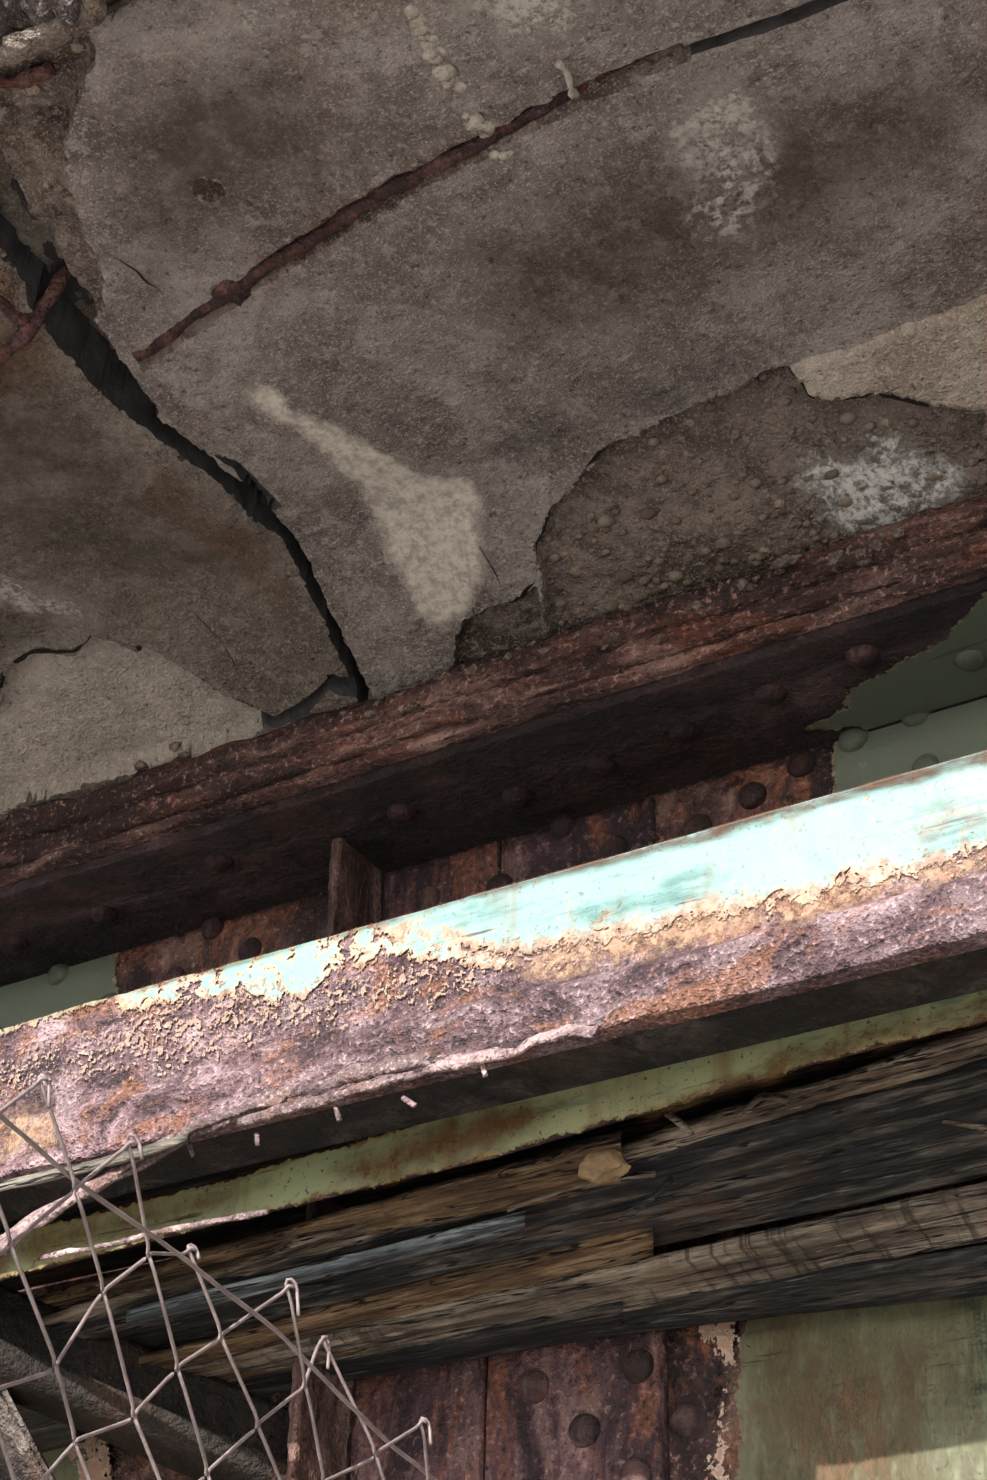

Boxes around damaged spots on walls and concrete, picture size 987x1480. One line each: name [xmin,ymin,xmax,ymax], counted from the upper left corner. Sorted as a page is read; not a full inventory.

crack [690,0,849,56]
crack [0,162,369,728]
efflorescence [250,385,482,623]
spalling [413,295,987,695]
peeling [0,592,987,1103]
rust [471,750,987,896]
rust [515,859,976,978]
peeling [0,990,987,1279]
peeling [698,1295,987,1480]